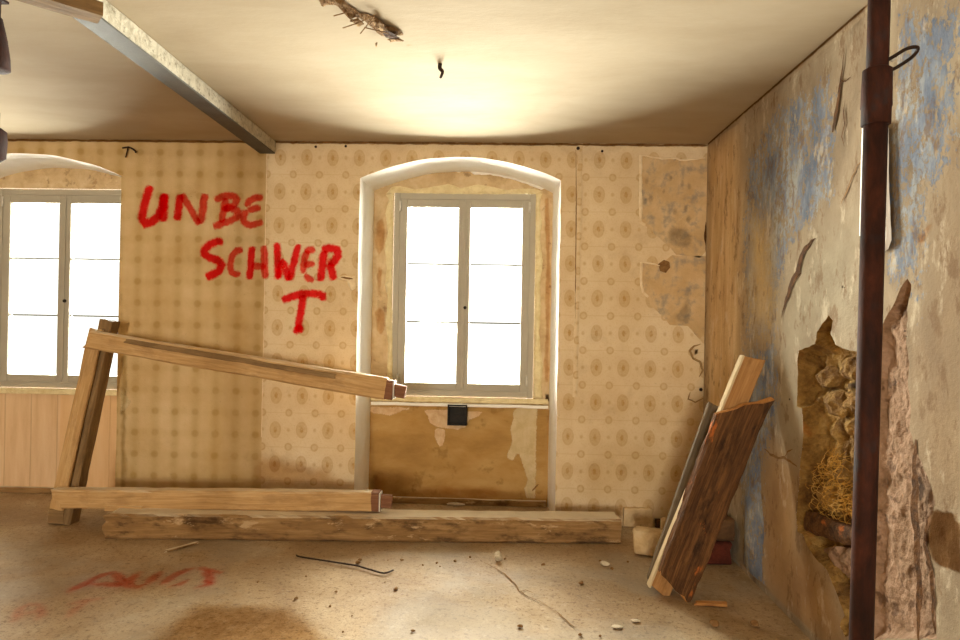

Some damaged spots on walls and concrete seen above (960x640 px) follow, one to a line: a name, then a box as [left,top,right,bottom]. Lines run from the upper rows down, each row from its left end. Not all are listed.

spalling [319,0,404,47]
crack [8,137,245,145]
crack [263,7,865,355]
flaking render [507,408,538,498]
spalling [789,315,857,637]
flaking render [874,279,937,640]
crack [484,562,577,629]